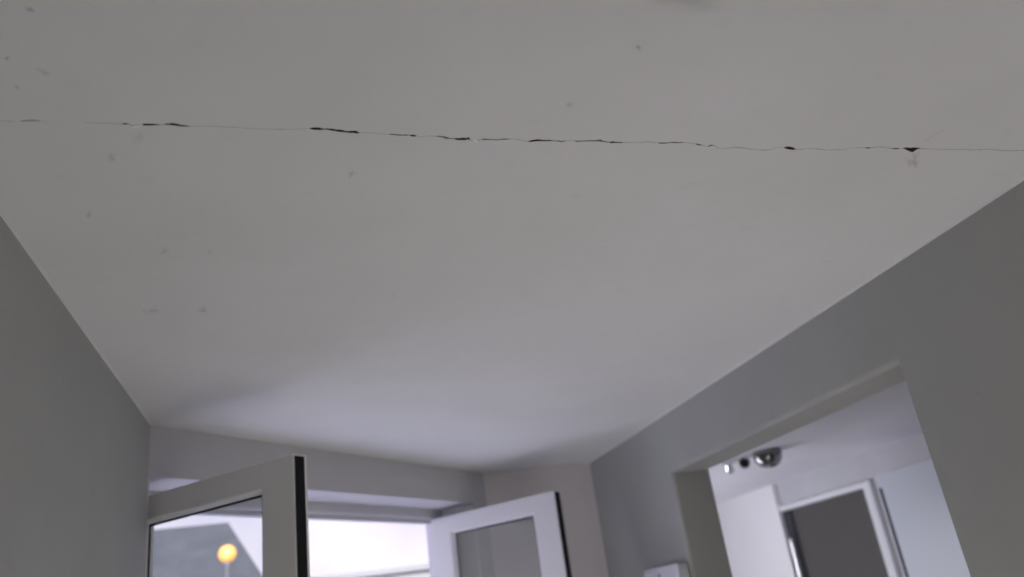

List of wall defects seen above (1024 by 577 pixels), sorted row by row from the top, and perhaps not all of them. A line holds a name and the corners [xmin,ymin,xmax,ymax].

crack [87,122,1024,151]